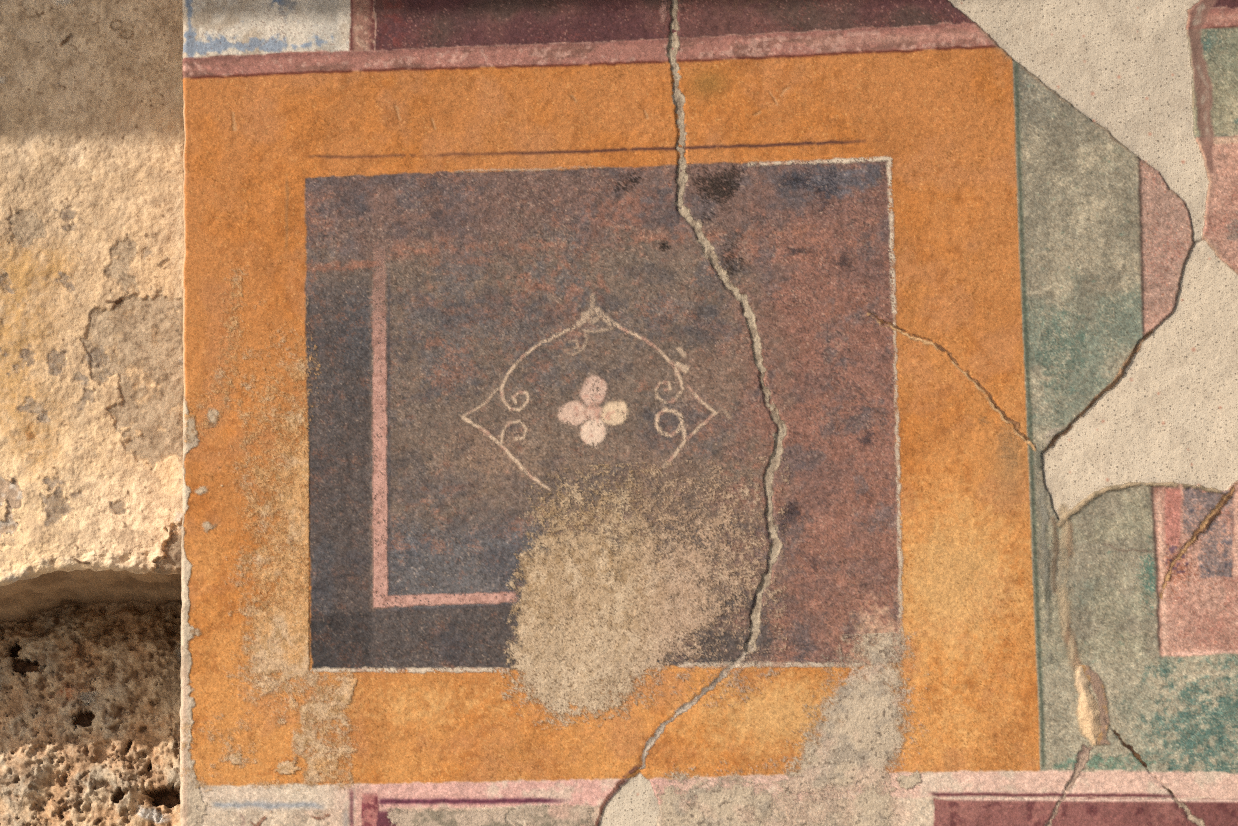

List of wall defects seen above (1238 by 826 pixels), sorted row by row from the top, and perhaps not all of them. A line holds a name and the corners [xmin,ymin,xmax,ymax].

spalling [948,0,1238,526]
crack [639,0,787,769]
crack [867,313,1036,450]
peeling [501,456,787,730]
crack [1159,483,1237,599]
peeling [387,632,923,826]
crack [1045,730,1205,826]